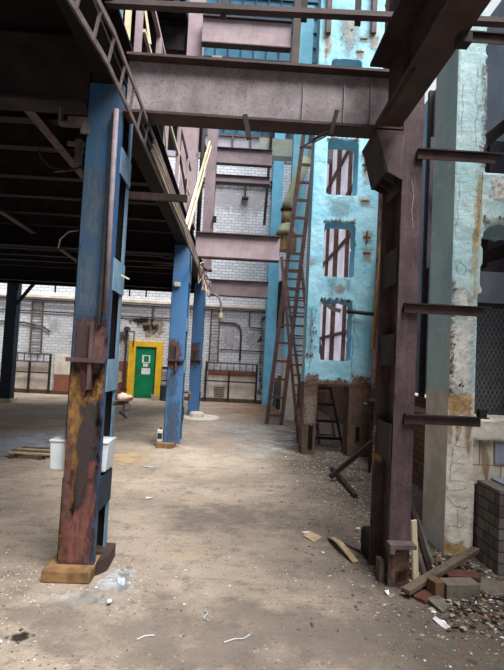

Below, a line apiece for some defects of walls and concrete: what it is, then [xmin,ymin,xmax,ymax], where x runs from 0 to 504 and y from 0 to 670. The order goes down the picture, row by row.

rust [469,174,483,303]
spalling [129,318,159,333]
rust [166,339,182,441]
peeling [305,373,371,388]
peeling [451,281,474,306]
peeling [449,315,476,397]
rust [58,317,109,564]
crack [446,429,468,545]
rust [444,539,466,556]